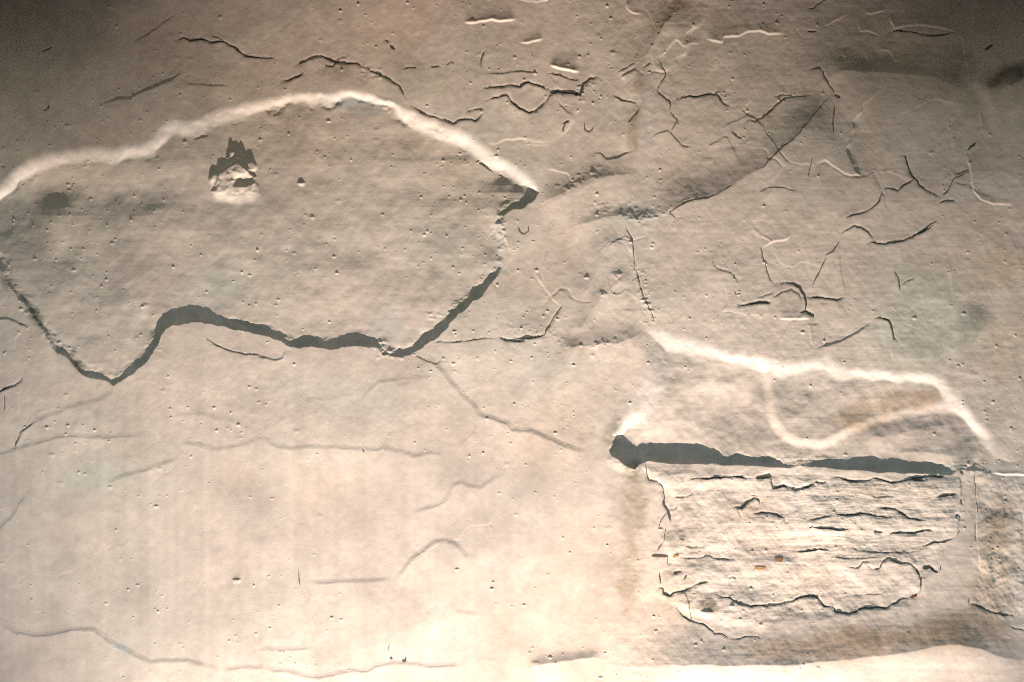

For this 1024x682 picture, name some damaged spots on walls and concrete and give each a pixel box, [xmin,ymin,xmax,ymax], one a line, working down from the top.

crack [889,29,955,37]
crack [644,6,840,192]
flaking render [0,88,595,455]
crack [626,229,654,321]
crack [669,184,733,219]
crack [715,143,976,317]
crack [414,307,562,363]
crack [875,317,897,341]
flaking render [609,312,1024,624]